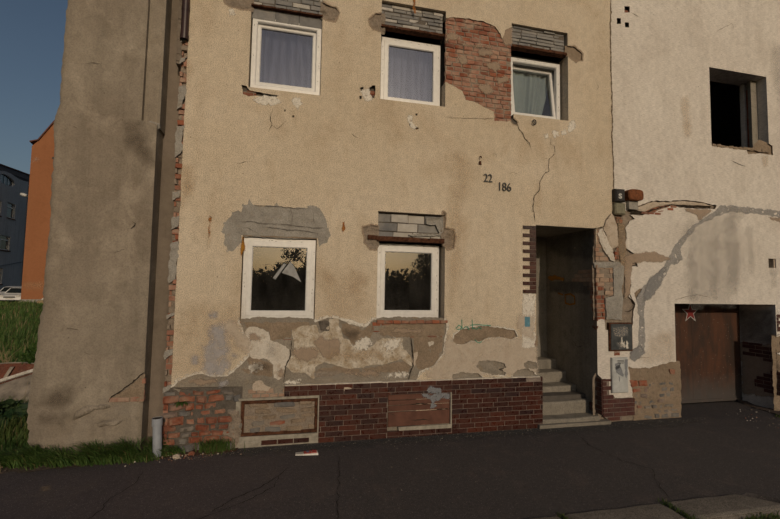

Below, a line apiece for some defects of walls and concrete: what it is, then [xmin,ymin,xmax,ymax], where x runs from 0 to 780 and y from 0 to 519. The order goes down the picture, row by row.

flaking render [223,0,254,12]
flaking render [320,1,340,22]
flaking render [242,86,277,97]
flaking render [444,14,518,125]
crack [517,124,555,218]
flaking render [592,211,642,330]
flaking render [171,315,519,414]
flaking render [452,359,537,379]
flaking render [771,335,780,411]